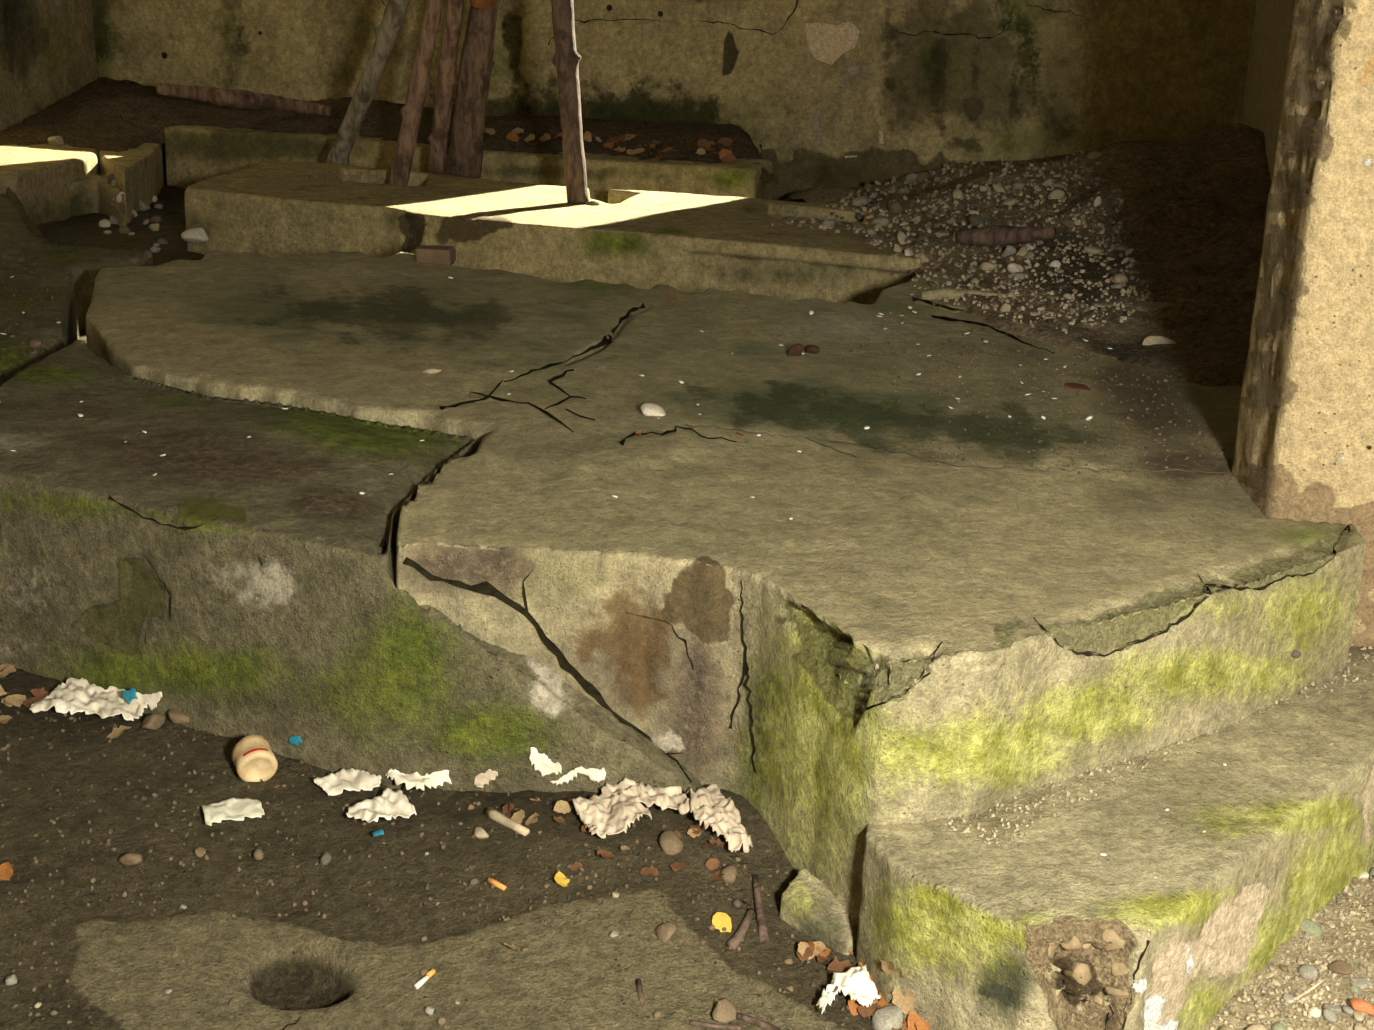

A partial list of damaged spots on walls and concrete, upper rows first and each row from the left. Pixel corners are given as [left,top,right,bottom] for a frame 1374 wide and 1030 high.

crack [548,0,798,45]
crack [439,303,645,432]
crack [619,424,1225,473]
crack [1034,525,1350,657]
crack [380,539,694,782]
spalling [1023,882,1271,1030]